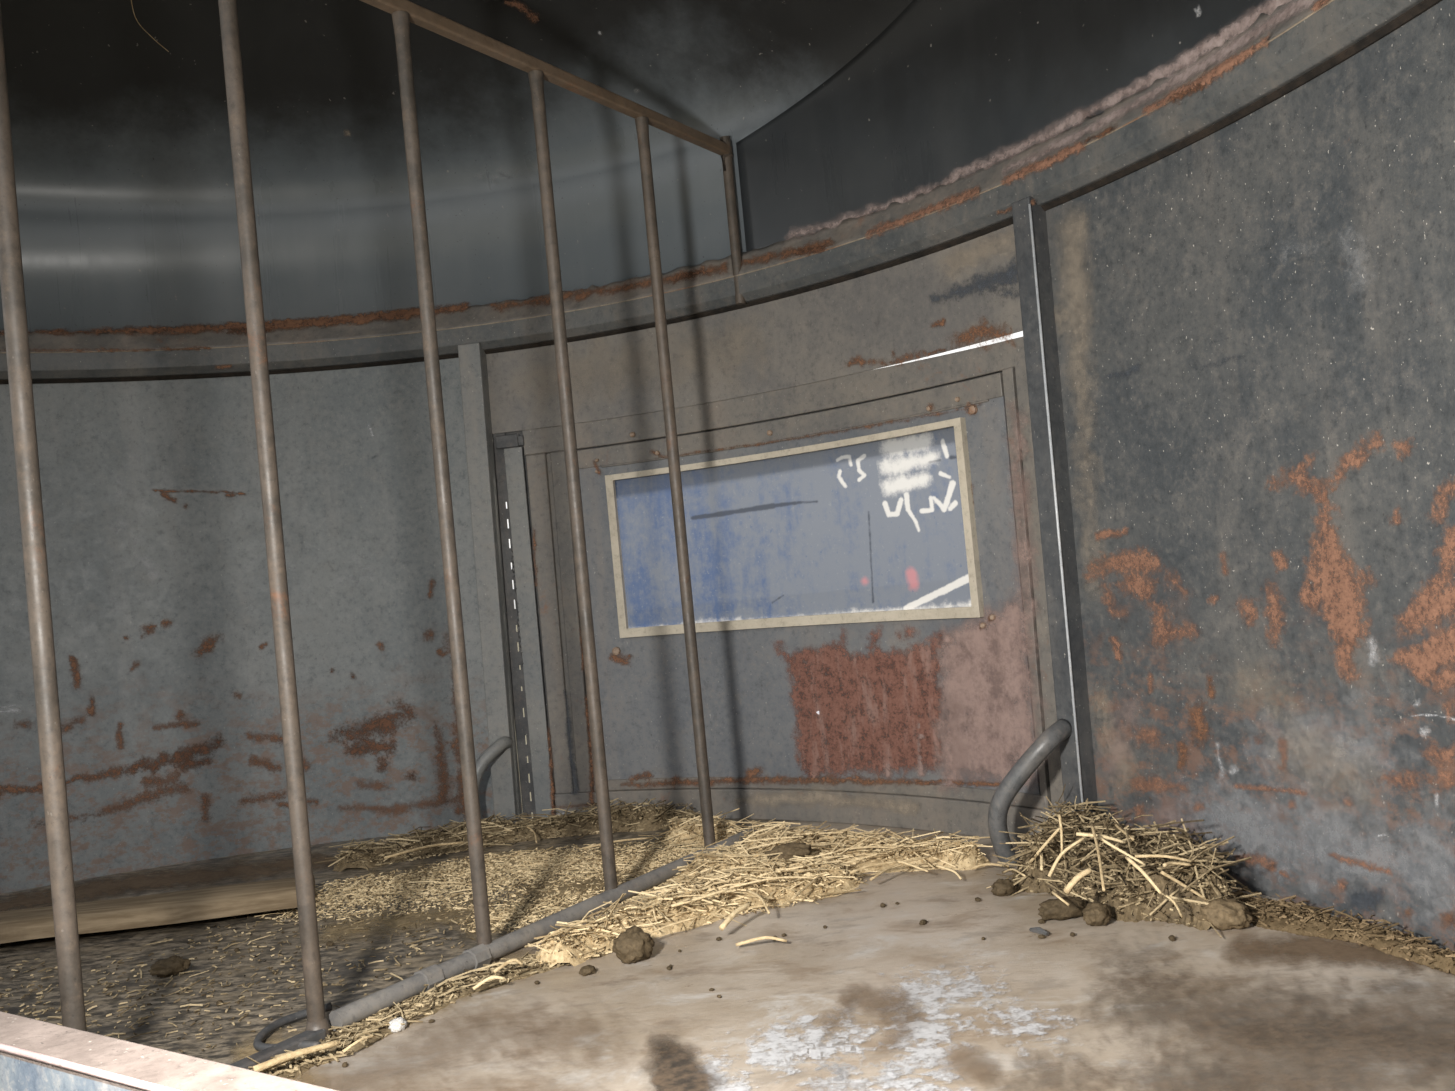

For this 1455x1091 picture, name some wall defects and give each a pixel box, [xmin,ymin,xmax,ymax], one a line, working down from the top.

corrosion [1142,36,1269,114]
corrosion [1001,127,1113,185]
corrosion [28,321,247,352]
corrosion [265,303,469,332]
corrosion [490,238,832,312]
corrosion [1086,527,1198,645]
corrosion [1267,432,1411,680]
corrosion [1392,483,1455,722]
corrosion [61,655,95,732]
corrosion [66,710,223,820]
corrosion [328,676,465,817]
corrosion [622,597,1035,788]